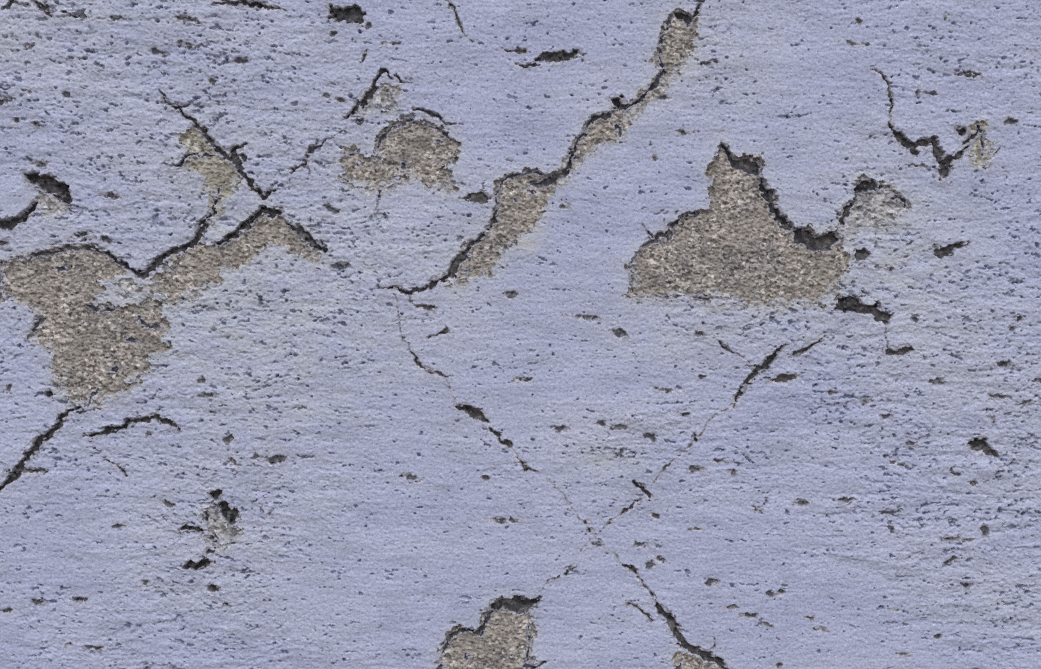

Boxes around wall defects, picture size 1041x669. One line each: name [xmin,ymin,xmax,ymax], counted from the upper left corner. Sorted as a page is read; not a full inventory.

spalling [499,46,588,70]
crack [106,49,458,283]
flaking render [337,114,493,223]
spalling [673,128,694,137]
crack [870,67,1001,185]
flaking render [0,127,351,408]
flaking render [620,141,915,359]
crack [380,0,827,669]
crack [0,387,181,507]
flaking render [433,564,579,669]